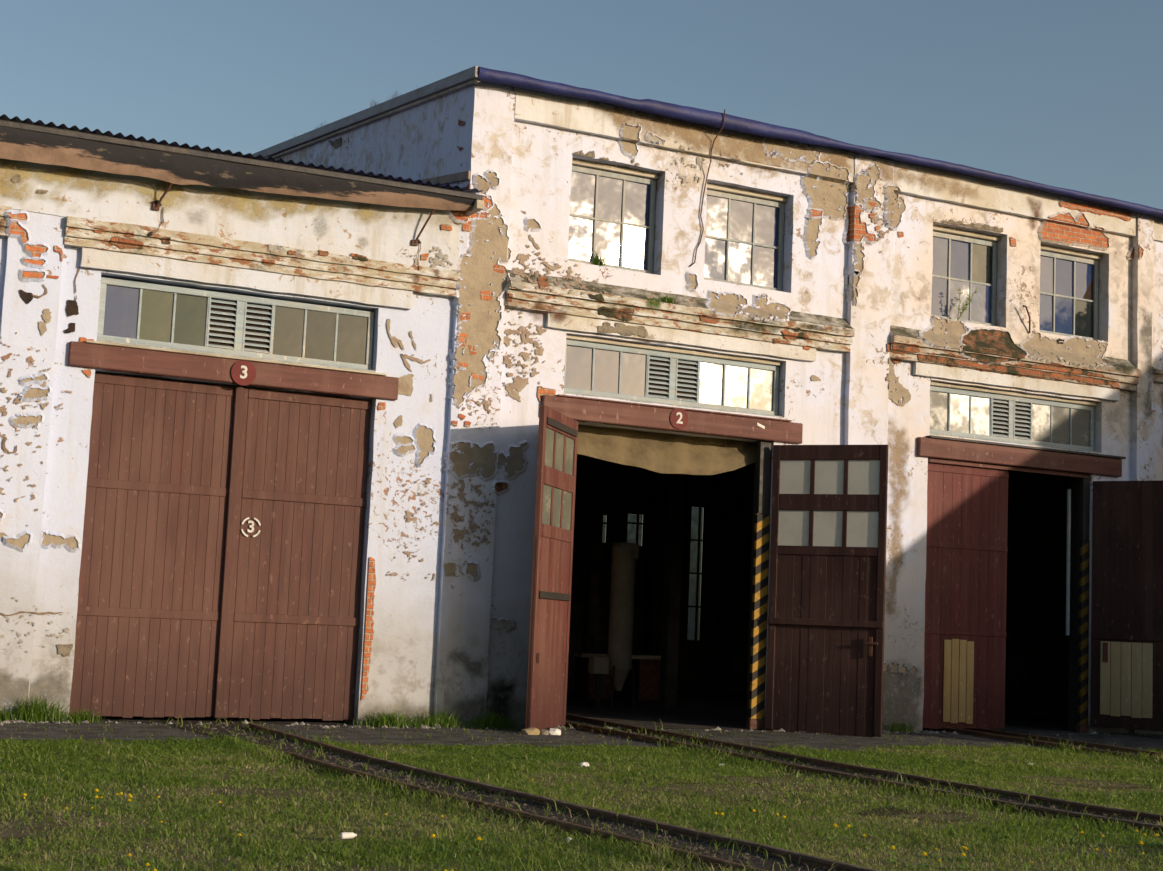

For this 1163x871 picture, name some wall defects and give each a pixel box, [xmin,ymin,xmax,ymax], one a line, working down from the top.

flaking render [4,210,63,304]
flaking render [94,227,171,249]
flaking render [254,243,296,265]
peeling [763,138,907,318]
flaking render [1037,202,1132,251]
peeling [38,308,52,335]
flaking render [64,300,94,342]
peeling [644,271,812,350]
peeling [0,332,81,553]
peeling [361,169,648,701]
peeling [0,606,73,657]